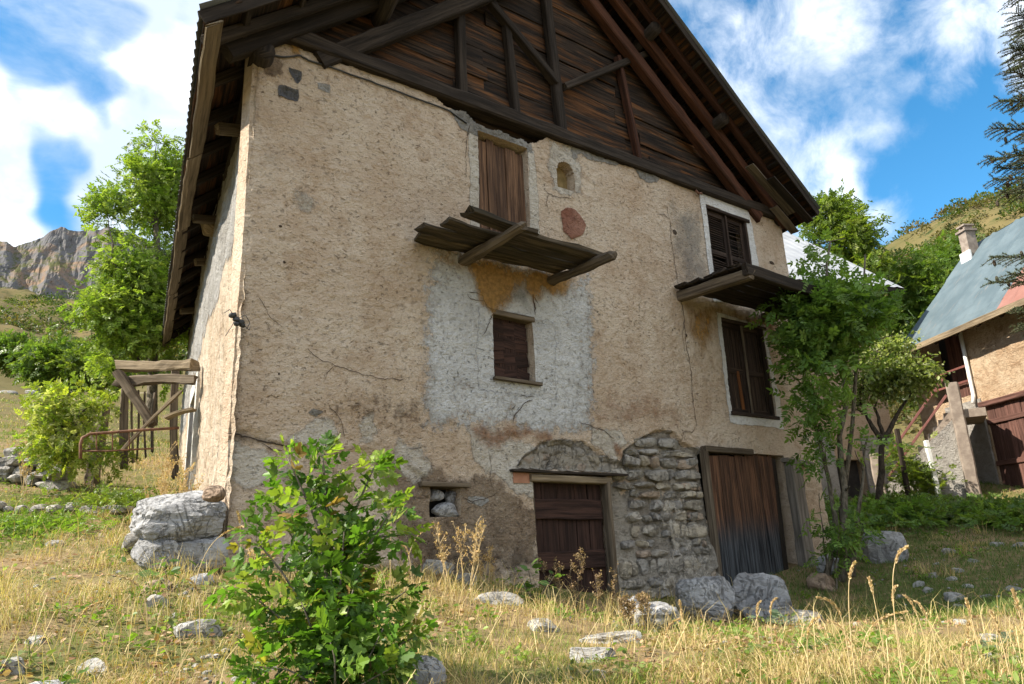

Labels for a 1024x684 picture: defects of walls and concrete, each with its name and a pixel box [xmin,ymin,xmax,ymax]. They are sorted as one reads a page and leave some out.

damp [469,260,569,312]
crack [308,349,403,381]
crack [681,301,697,439]
flaking render [228,440,272,490]